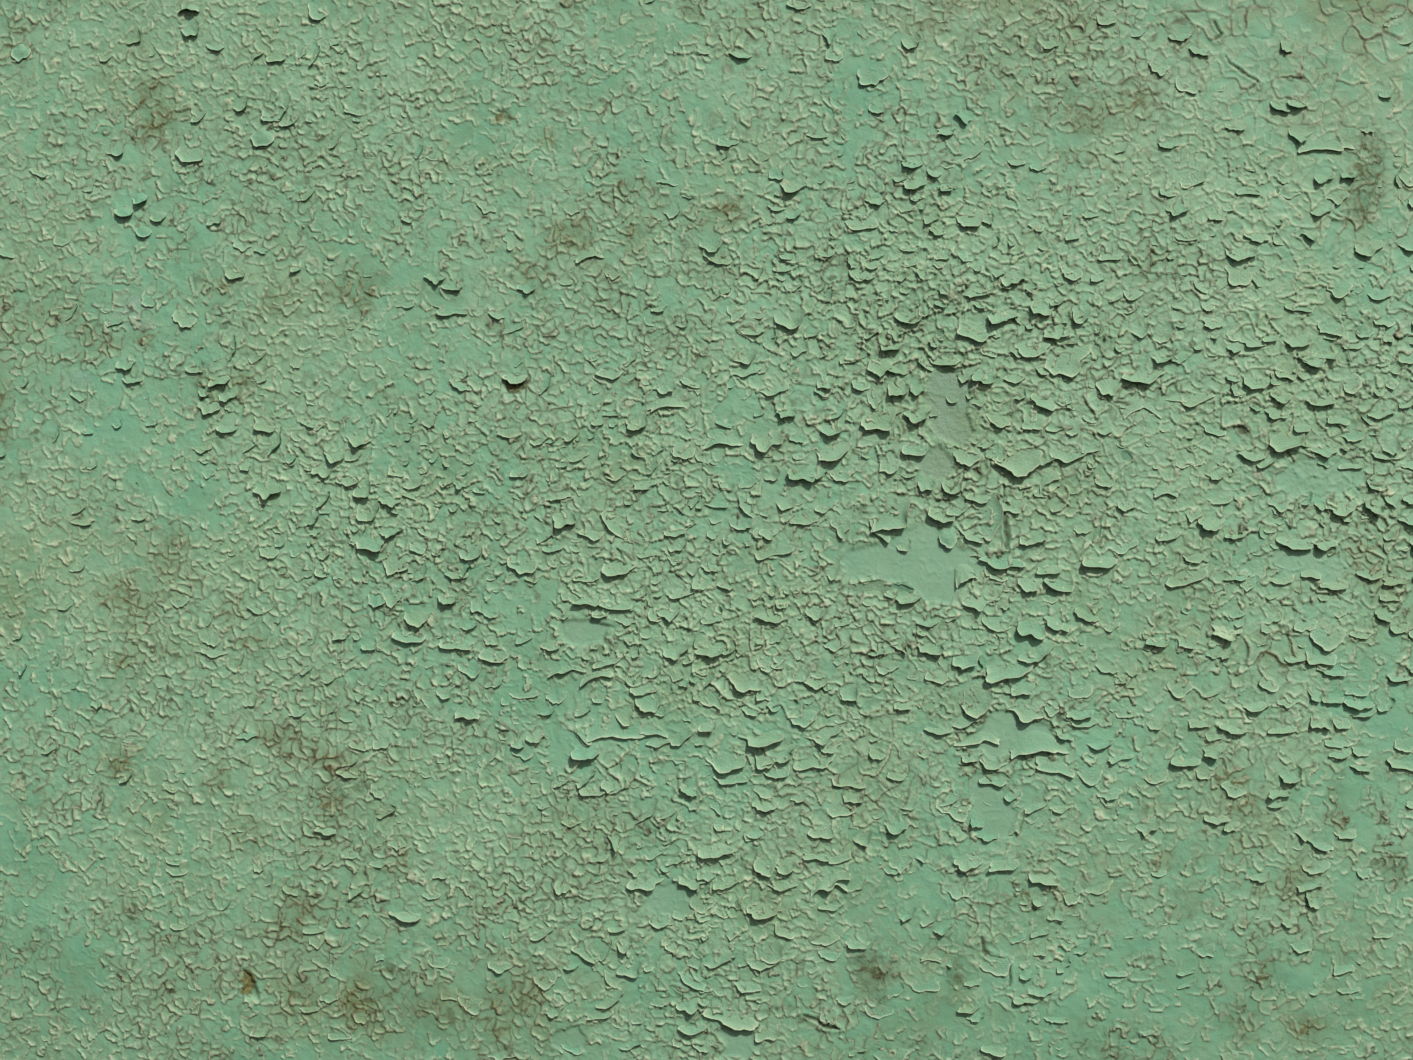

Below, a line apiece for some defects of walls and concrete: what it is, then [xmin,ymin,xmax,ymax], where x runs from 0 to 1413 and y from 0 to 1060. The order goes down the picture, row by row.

peeling [1096,10,1147,37]
peeling [800,26,843,61]
peeling [1026,40,1060,49]
peeling [857,66,888,85]
peeling [1149,33,1210,94]
peeling [1270,99,1308,112]
peeling [175,146,203,162]
peeling [114,193,167,237]
peeling [172,310,197,328]
peeling [115,341,150,399]
peeling [184,107,1413,1060]
peeling [165,840,188,876]